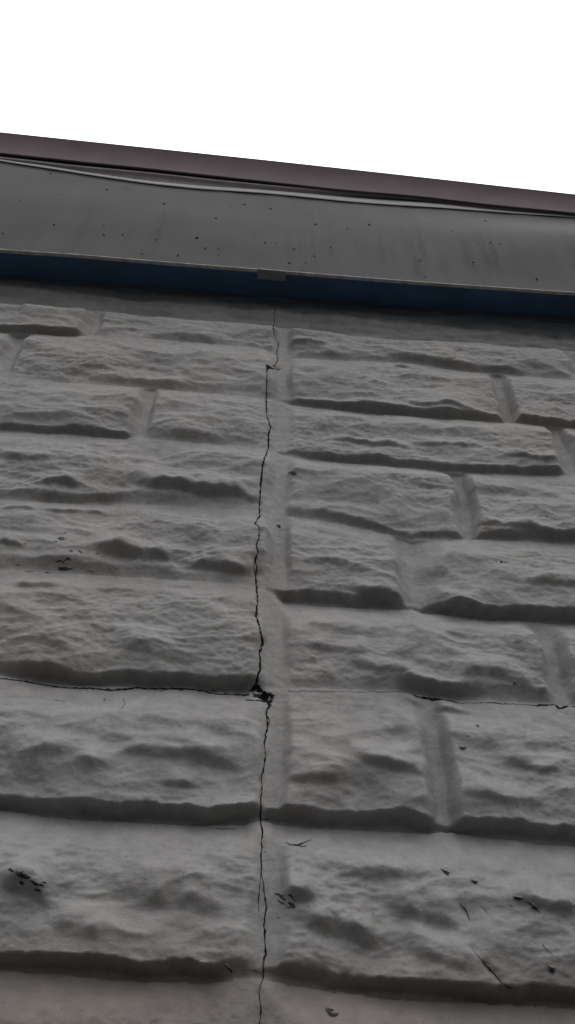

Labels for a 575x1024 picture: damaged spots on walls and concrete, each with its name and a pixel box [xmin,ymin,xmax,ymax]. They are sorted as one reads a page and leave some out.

crack [0,313,575,1024]